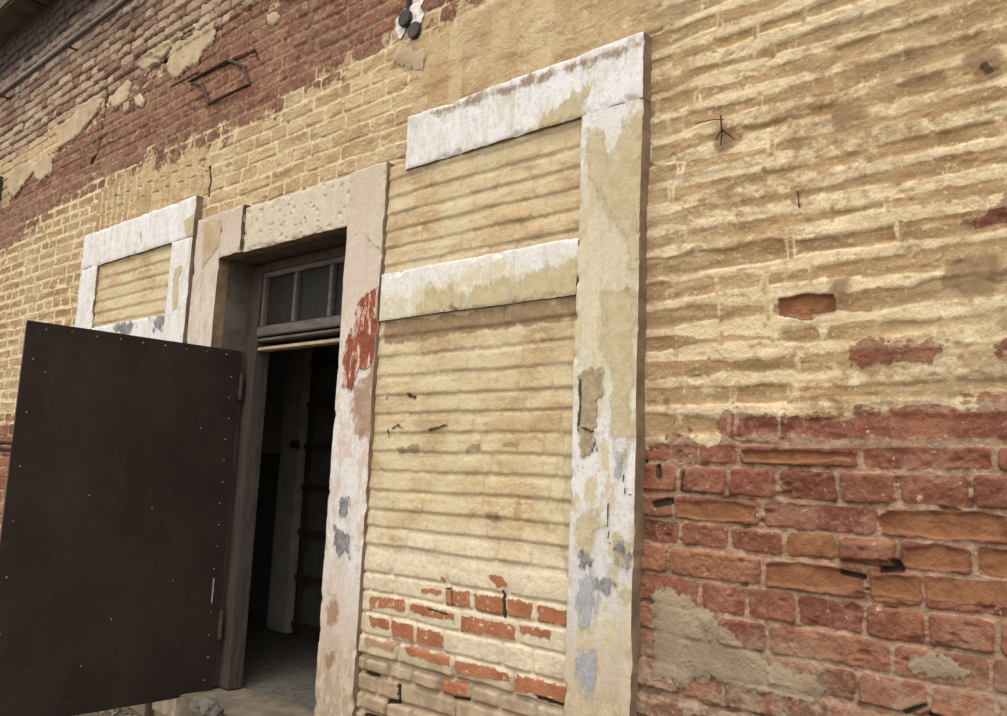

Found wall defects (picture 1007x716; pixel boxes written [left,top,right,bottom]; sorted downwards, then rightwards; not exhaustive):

peeling [0,0,482,255]
peeling [961,192,1007,229]
peeling [577,287,637,458]
spalling [778,293,836,320]
peeling [848,334,950,369]
peeling [993,338,1007,361]
peeling [0,413,14,531]
peeling [576,391,1007,716]
peeling [365,574,567,702]